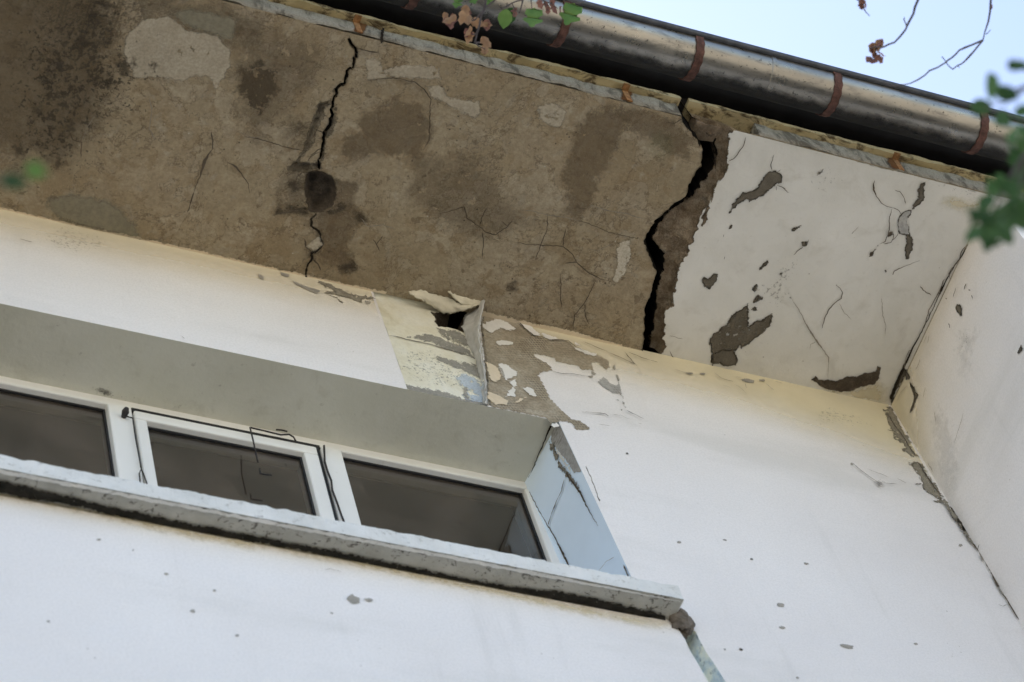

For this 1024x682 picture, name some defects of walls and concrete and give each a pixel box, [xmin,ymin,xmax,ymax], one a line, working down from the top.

mould [0,0,157,178]
crack [240,28,384,277]
crack [444,101,746,376]
peeling [723,155,785,237]
peeling [898,182,925,259]
flaking render [409,289,624,495]
peeling [687,284,773,375]
peeling [811,366,881,392]
peeling [883,369,943,503]